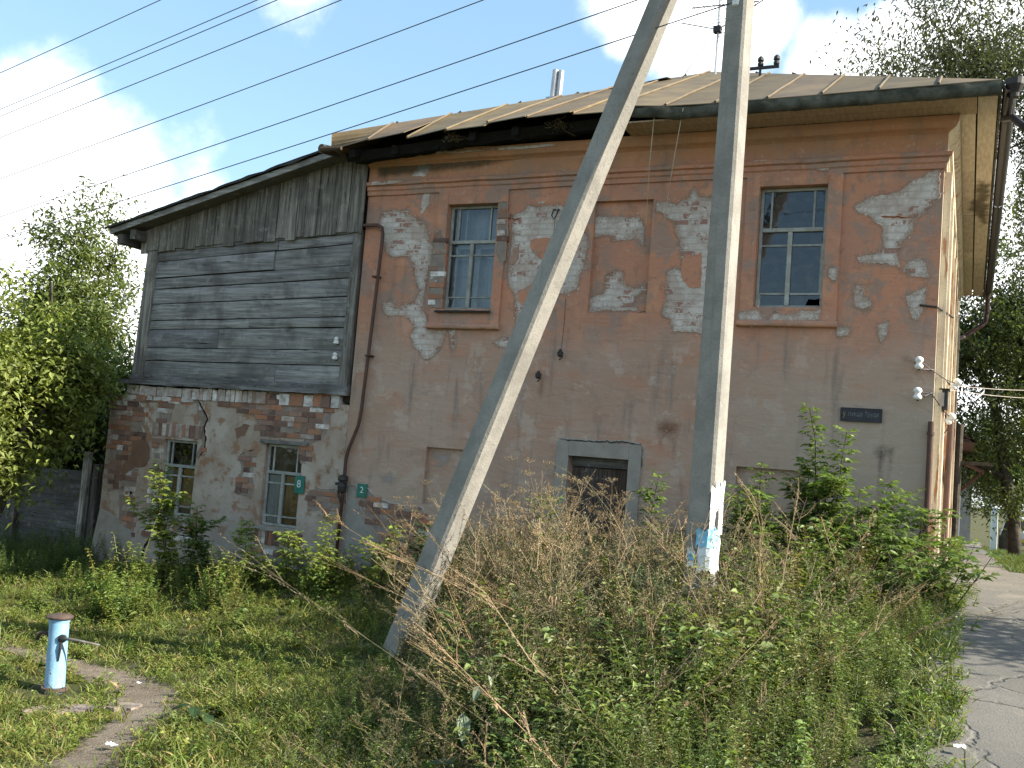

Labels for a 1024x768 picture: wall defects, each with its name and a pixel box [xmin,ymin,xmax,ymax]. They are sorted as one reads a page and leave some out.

peeling [379,193,456,363]
peeling [496,201,563,324]
peeling [556,213,646,302]
peeling [589,269,648,313]
peeling [655,188,712,336]
peeling [852,169,945,321]
crack [198,400,209,459]
spalling [102,391,334,537]